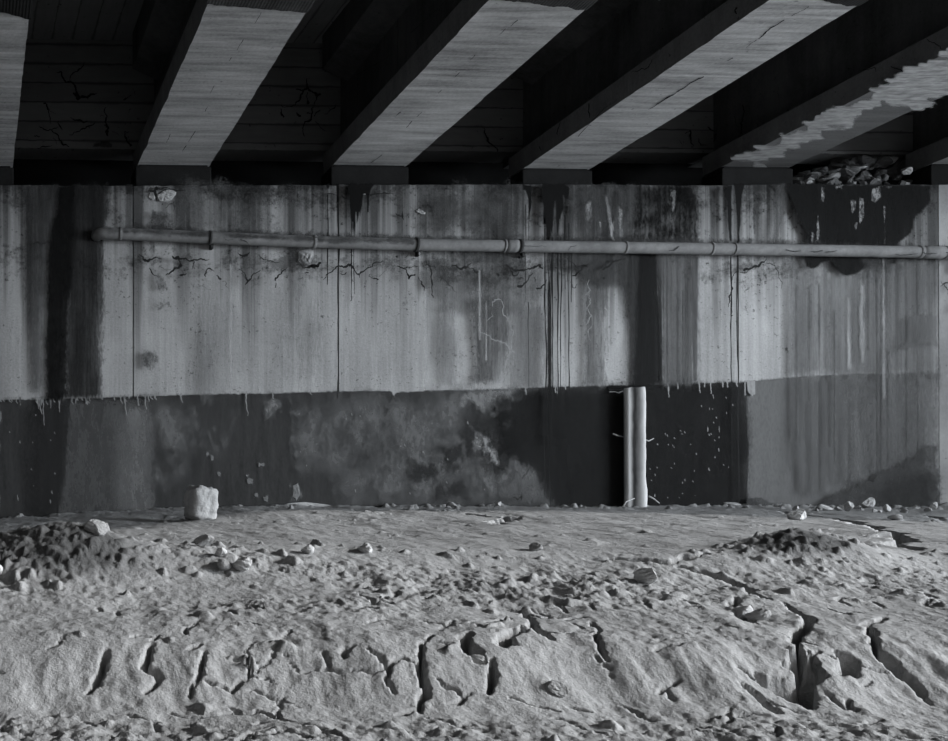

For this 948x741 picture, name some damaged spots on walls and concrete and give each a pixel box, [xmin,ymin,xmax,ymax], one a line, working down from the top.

peeling [731,48,948,167]
leakage [569,183,700,242]
leakage [777,183,931,246]
leakage [24,183,109,516]
crack [139,239,624,381]
leakage [419,251,773,507]
leakage [792,256,942,507]